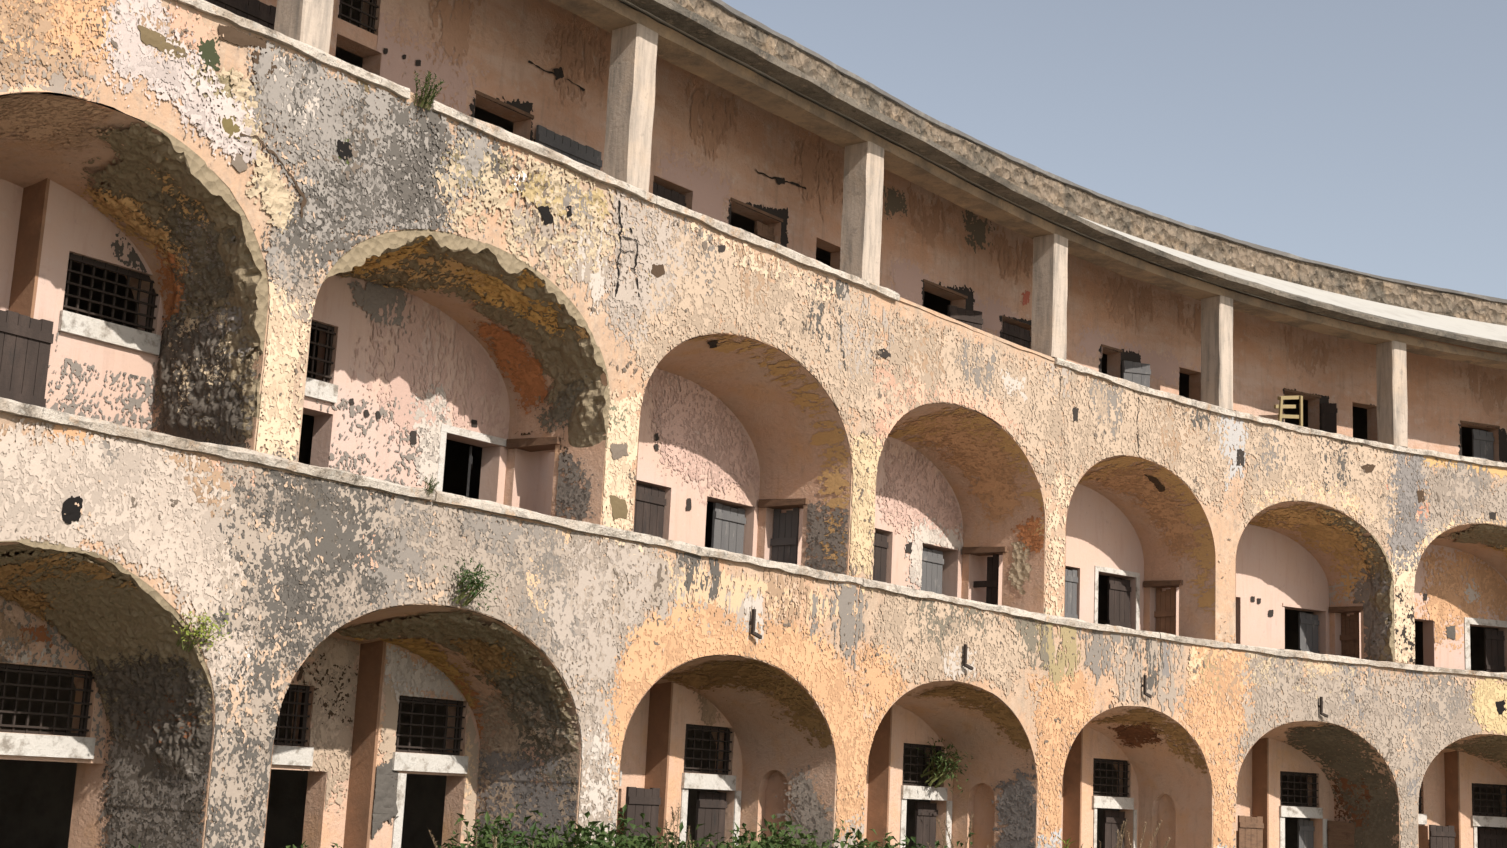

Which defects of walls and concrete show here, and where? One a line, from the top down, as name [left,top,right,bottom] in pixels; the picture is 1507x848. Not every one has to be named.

water stain [45,201,256,473]
water stain [254,45,514,311]
water stain [316,289,510,486]
spalling [0,0,883,640]
water stain [0,463,1203,848]
crack [615,200,640,297]
water stain [510,164,1507,579]
spalling [1145,475,1165,492]
spalling [1185,424,1507,734]
water stain [1198,571,1507,848]